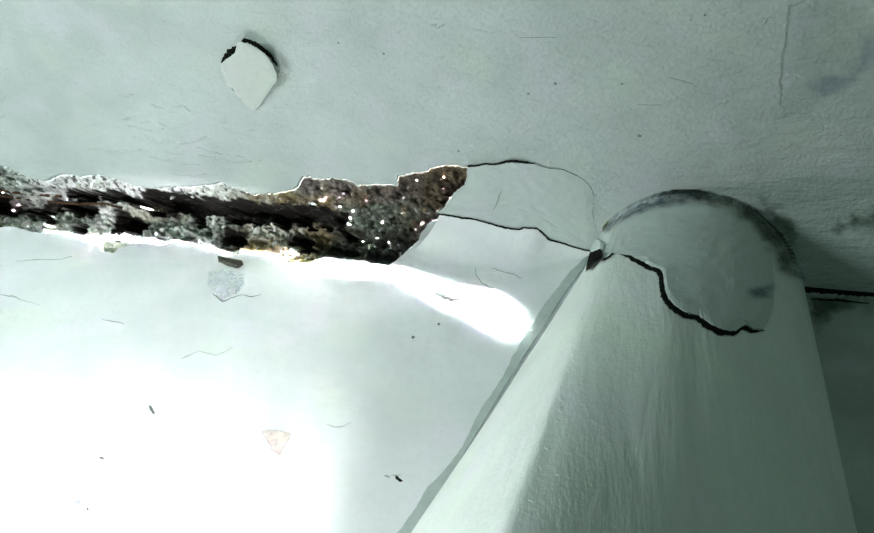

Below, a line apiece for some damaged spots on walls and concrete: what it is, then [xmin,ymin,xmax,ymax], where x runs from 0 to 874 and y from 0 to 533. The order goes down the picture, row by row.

flaking render [220,38,277,110]
crack [467,160,574,175]
spalling [0,165,468,265]
crack [398,267,522,308]
crack [437,213,764,336]
crack [811,297,869,305]